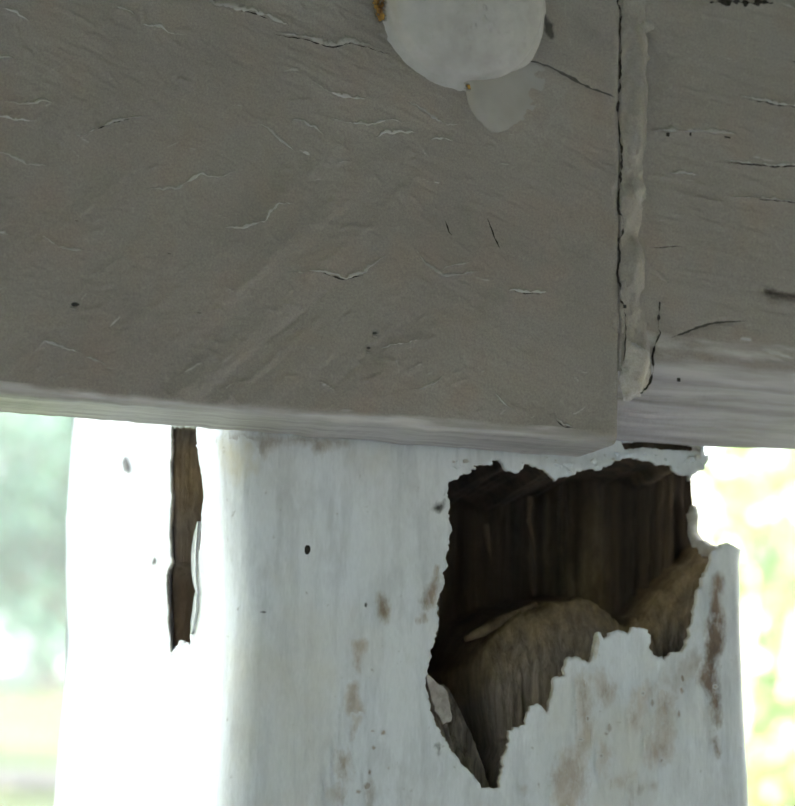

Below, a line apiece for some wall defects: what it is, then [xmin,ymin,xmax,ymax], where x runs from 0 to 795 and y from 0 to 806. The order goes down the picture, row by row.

crack [767,290,795,298]
crack [641,302,739,394]
peeling [426,674,452,724]
water stain [543,642,704,806]